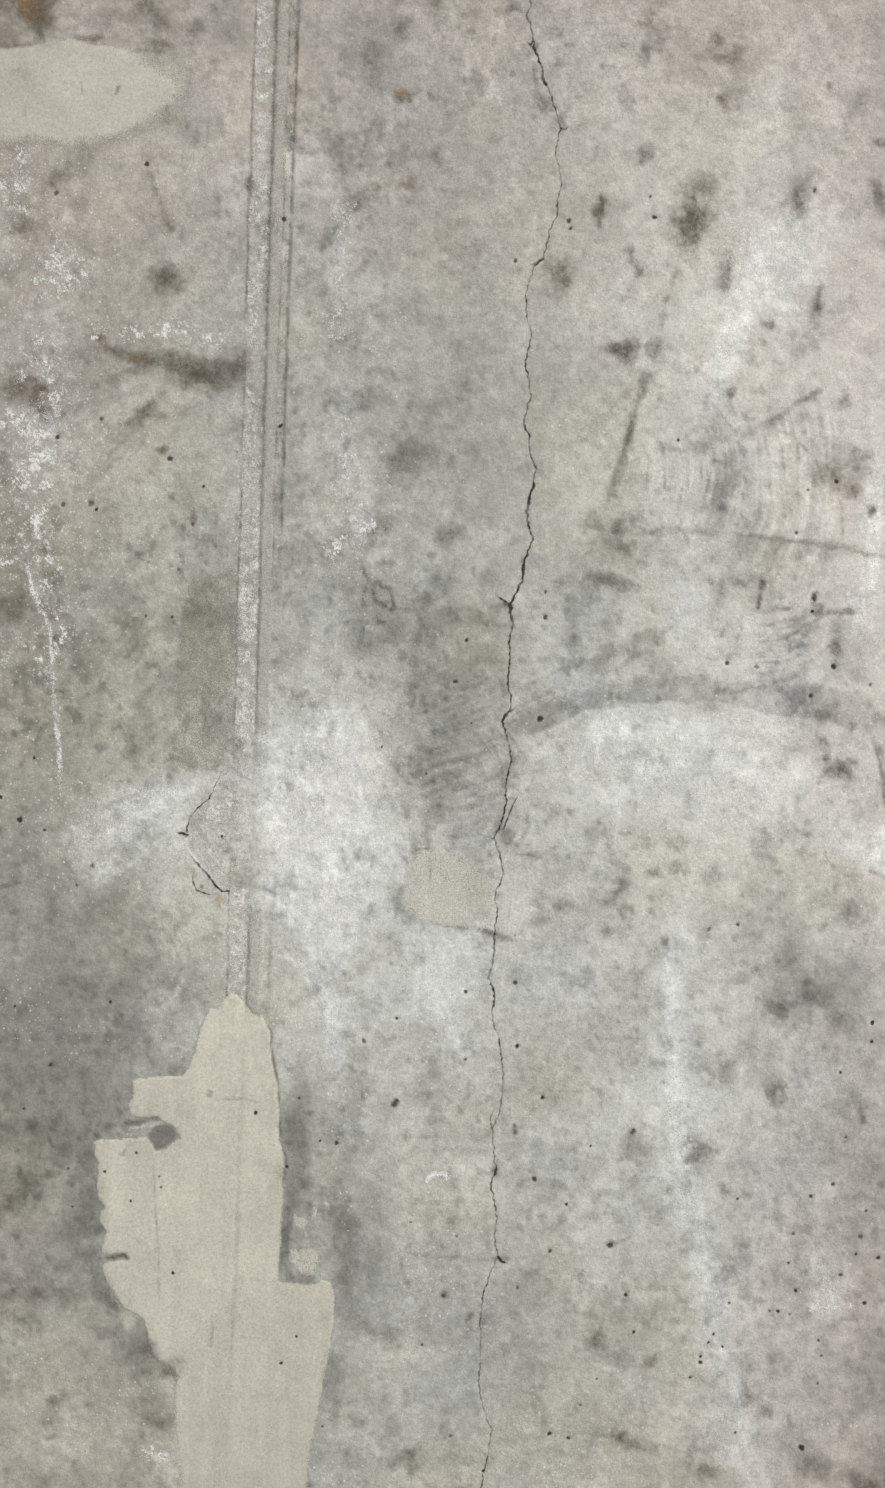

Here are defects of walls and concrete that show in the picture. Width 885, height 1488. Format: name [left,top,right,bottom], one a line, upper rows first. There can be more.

peeling [288,1161,335,1277]
crack [479,1,562,1325]